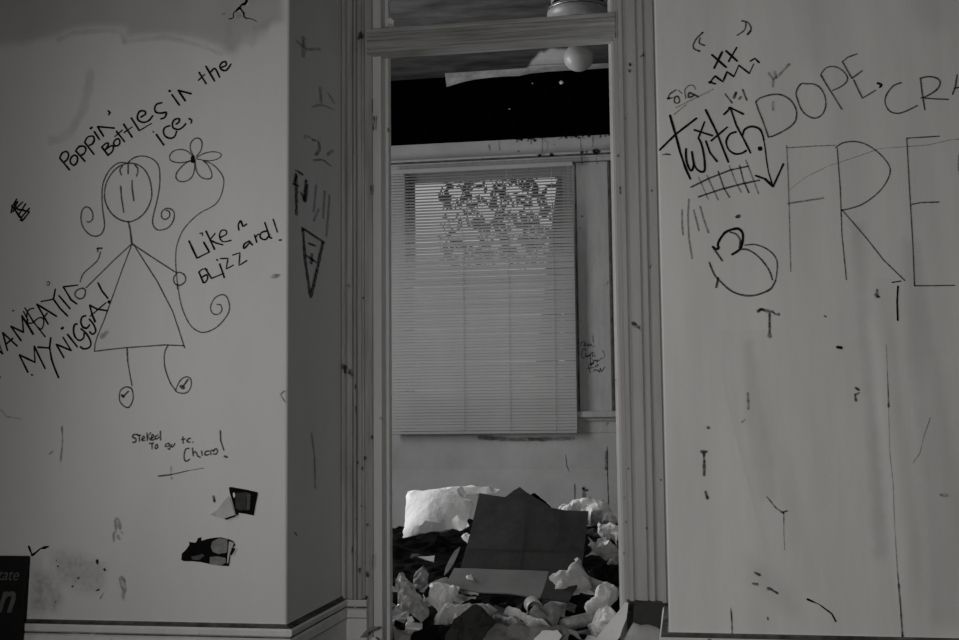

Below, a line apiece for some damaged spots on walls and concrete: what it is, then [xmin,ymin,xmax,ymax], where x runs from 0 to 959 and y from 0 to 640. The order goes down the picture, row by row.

crack [224,0,257,22]